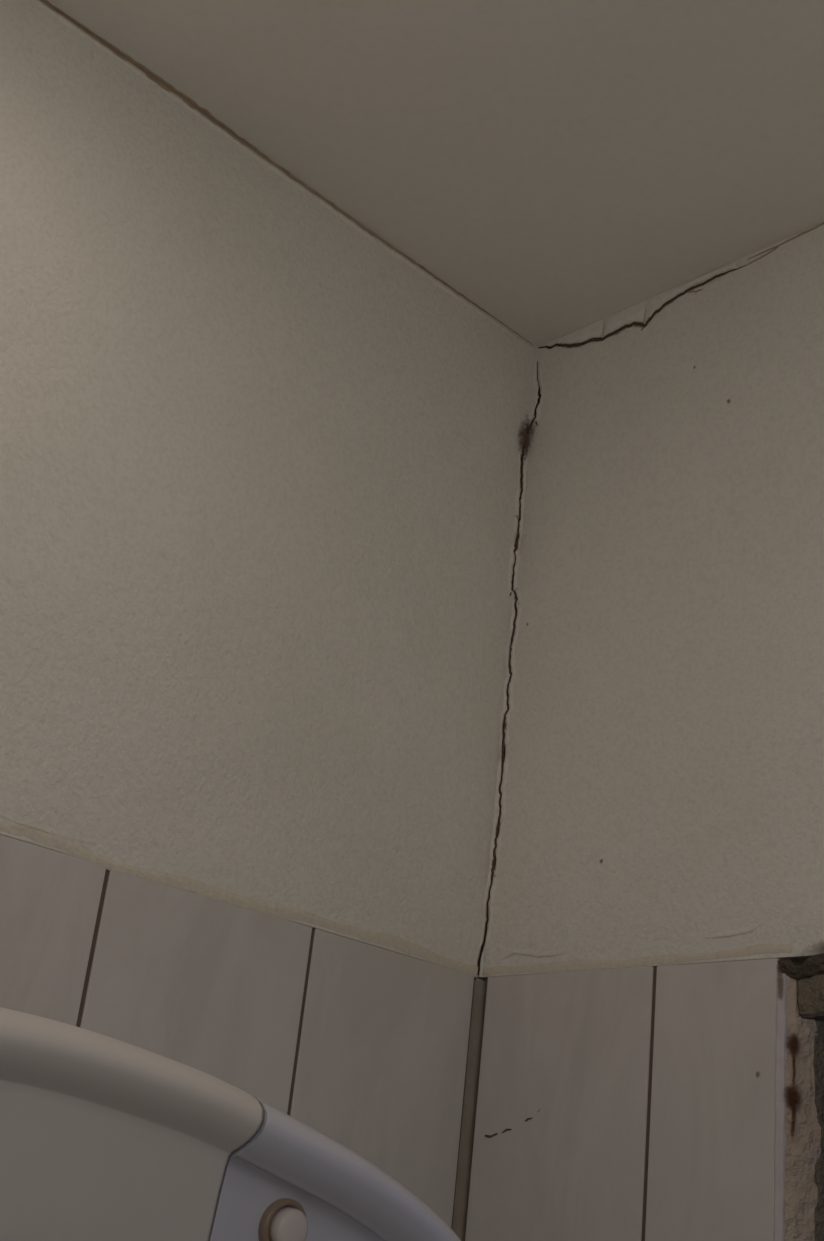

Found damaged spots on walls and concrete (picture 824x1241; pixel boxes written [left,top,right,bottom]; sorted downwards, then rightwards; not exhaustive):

crack [31,0,824,977]